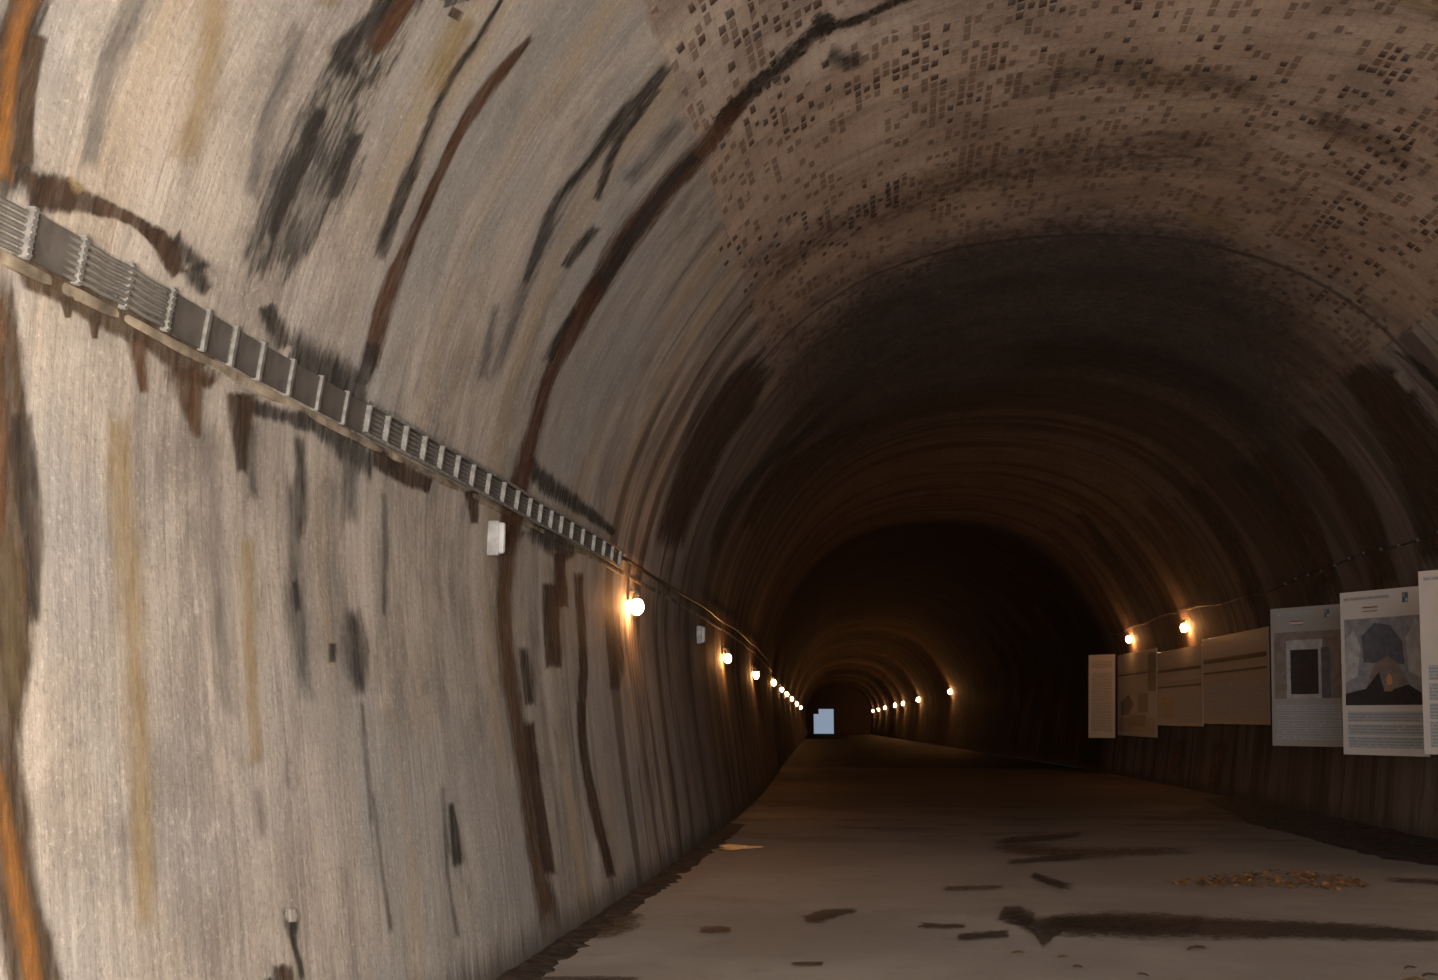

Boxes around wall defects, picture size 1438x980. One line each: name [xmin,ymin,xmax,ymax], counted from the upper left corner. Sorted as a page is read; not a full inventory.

rust [0,0,48,198]
leakage [249,38,299,186]
leakage [376,0,503,256]
crack [716,0,908,121]
rust [228,393,254,472]
leakage [252,400,433,678]
leakage [465,491,478,523]
rust [0,254,228,980]
leakage [329,615,364,731]